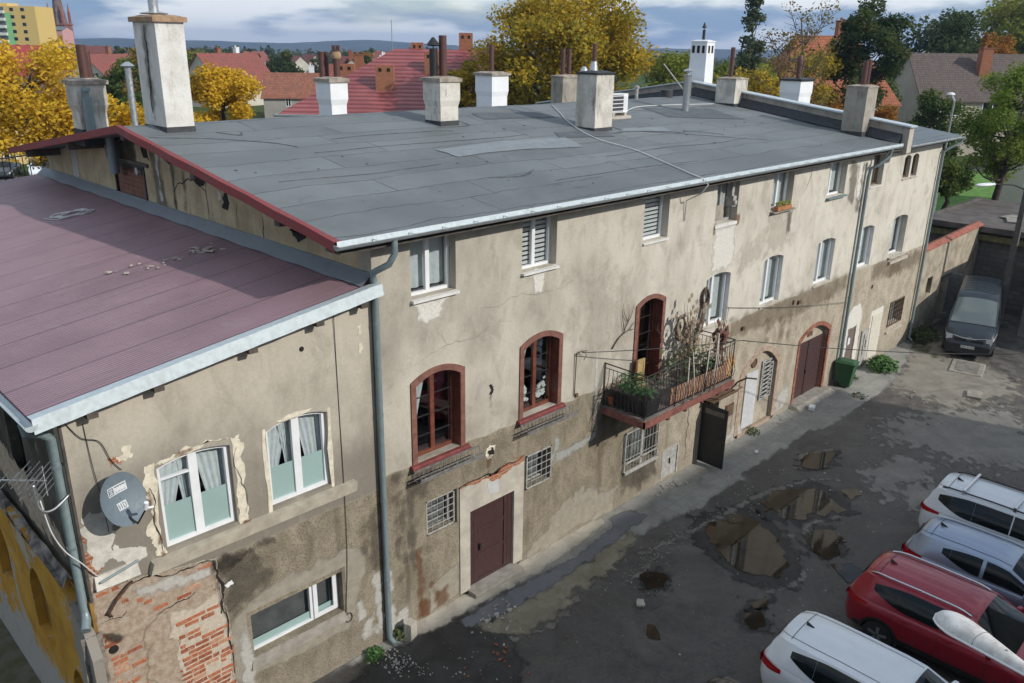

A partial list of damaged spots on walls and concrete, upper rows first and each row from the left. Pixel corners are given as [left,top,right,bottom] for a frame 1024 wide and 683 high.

crack [143,27,153,112]
crack [172,173,209,213]
spalling [217,190,229,211]
peeling [262,429,273,513]
peeling [275,408,312,422]
peeling [327,407,335,487]
flaking render [458,455,524,489]
leakage [552,432,596,462]
flaking render [80,434,249,683]
crack [132,560,235,671]
leakage [224,550,270,611]
corrosion [416,550,447,617]